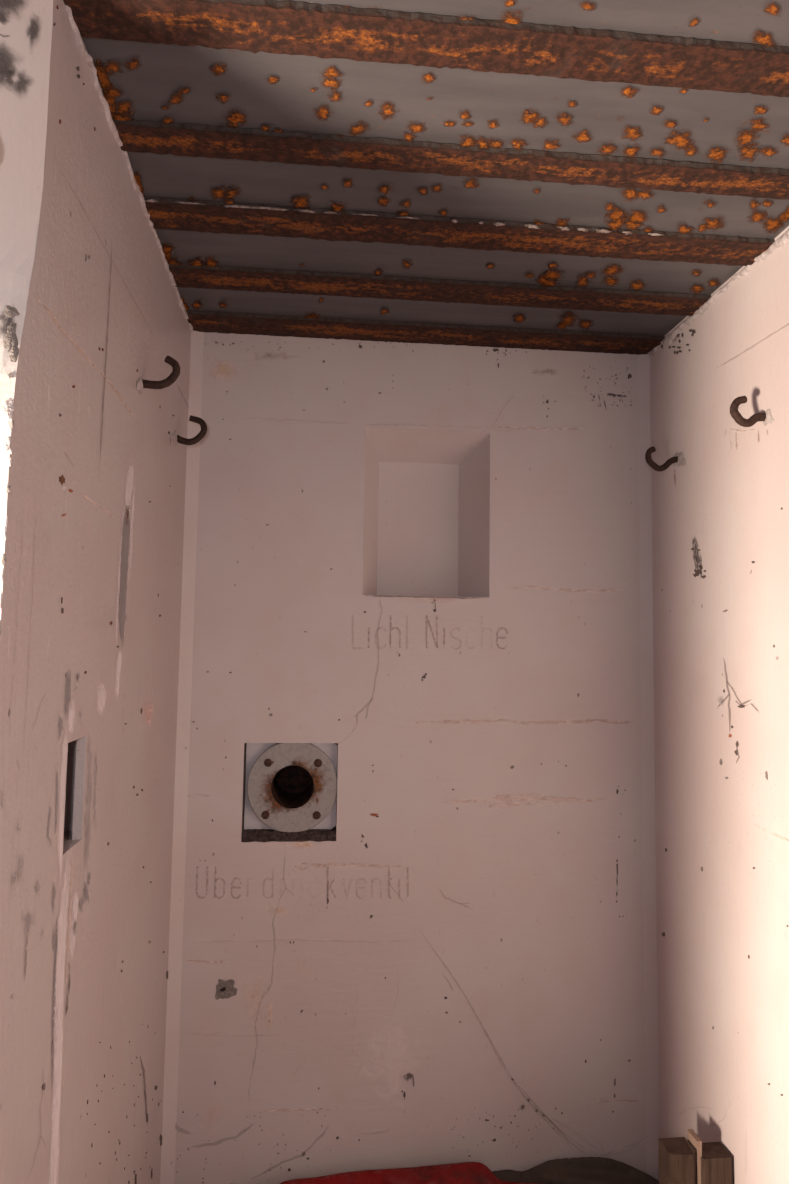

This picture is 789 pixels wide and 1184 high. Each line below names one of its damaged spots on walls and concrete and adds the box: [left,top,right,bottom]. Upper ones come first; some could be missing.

rust [502,0,521,24]
rust [753,31,775,47]
rust [95,58,141,121]
rust [311,66,342,120]
rust [364,100,394,120]
rust [444,111,529,150]
rust [521,101,789,163]
rust [605,188,666,232]
rust [678,201,723,234]
rust [748,200,789,234]
rust [162,243,218,267]
spalling [0,516,8,635]